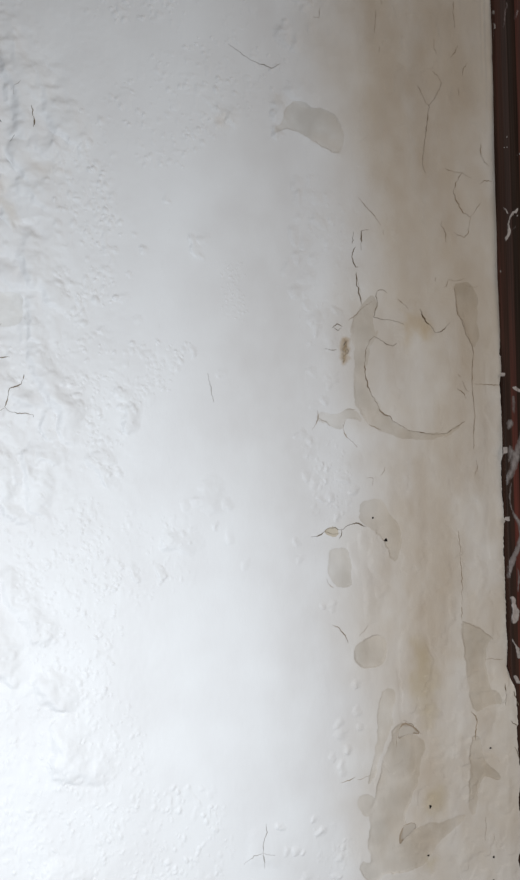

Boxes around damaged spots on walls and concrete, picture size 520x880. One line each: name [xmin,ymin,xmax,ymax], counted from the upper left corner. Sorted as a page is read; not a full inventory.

peeling [274,101,344,153]
crack [442,145,491,240]
peeling [454,282,480,347]
peeling [317,296,460,440]
peeling [359,499,402,562]
peeling [328,548,352,588]
peeling [354,634,387,669]